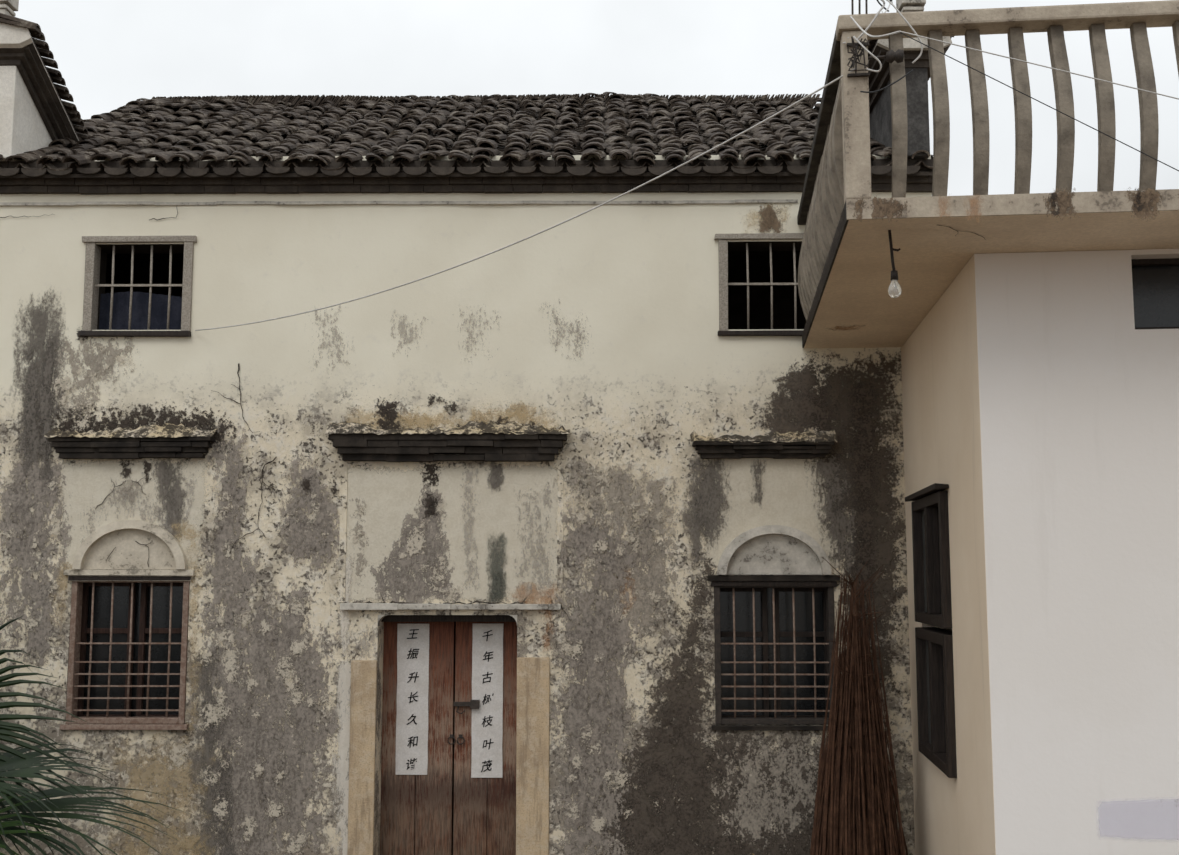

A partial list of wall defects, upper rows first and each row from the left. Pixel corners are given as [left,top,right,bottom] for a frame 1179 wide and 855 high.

water stain [14,293,239,481]
water stain [369,385,406,430]
water stain [428,392,457,414]
water stain [476,409,539,427]
water stain [420,461,444,487]
water stain [488,462,504,491]
water stain [751,461,765,504]
water stain [682,459,732,562]
water stain [487,534,506,602]
flaking render [188,422,464,855]